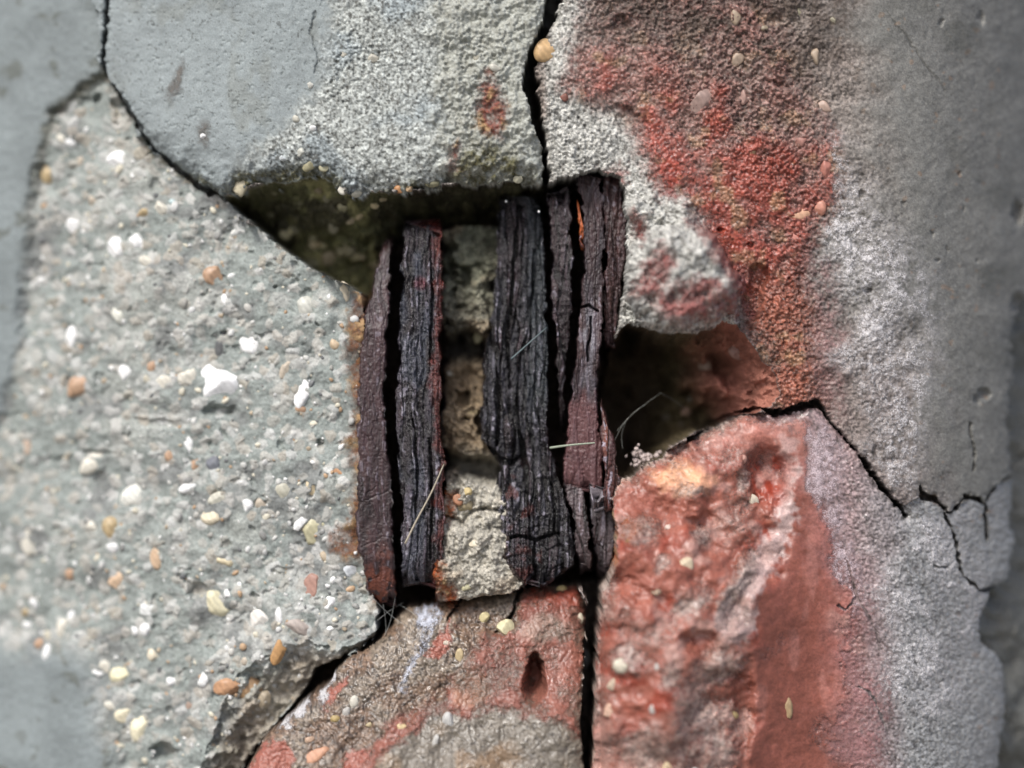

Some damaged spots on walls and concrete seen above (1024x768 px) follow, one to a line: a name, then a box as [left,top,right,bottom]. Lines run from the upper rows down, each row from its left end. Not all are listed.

crack [101,0,216,198]
crack [309,11,320,75]
crack [522,0,563,188]
rust [329,219,456,611]
rust [479,173,633,588]
peeling [344,0,889,768]
crack [687,398,1013,593]
crack [245,608,397,768]
crack [578,568,603,768]